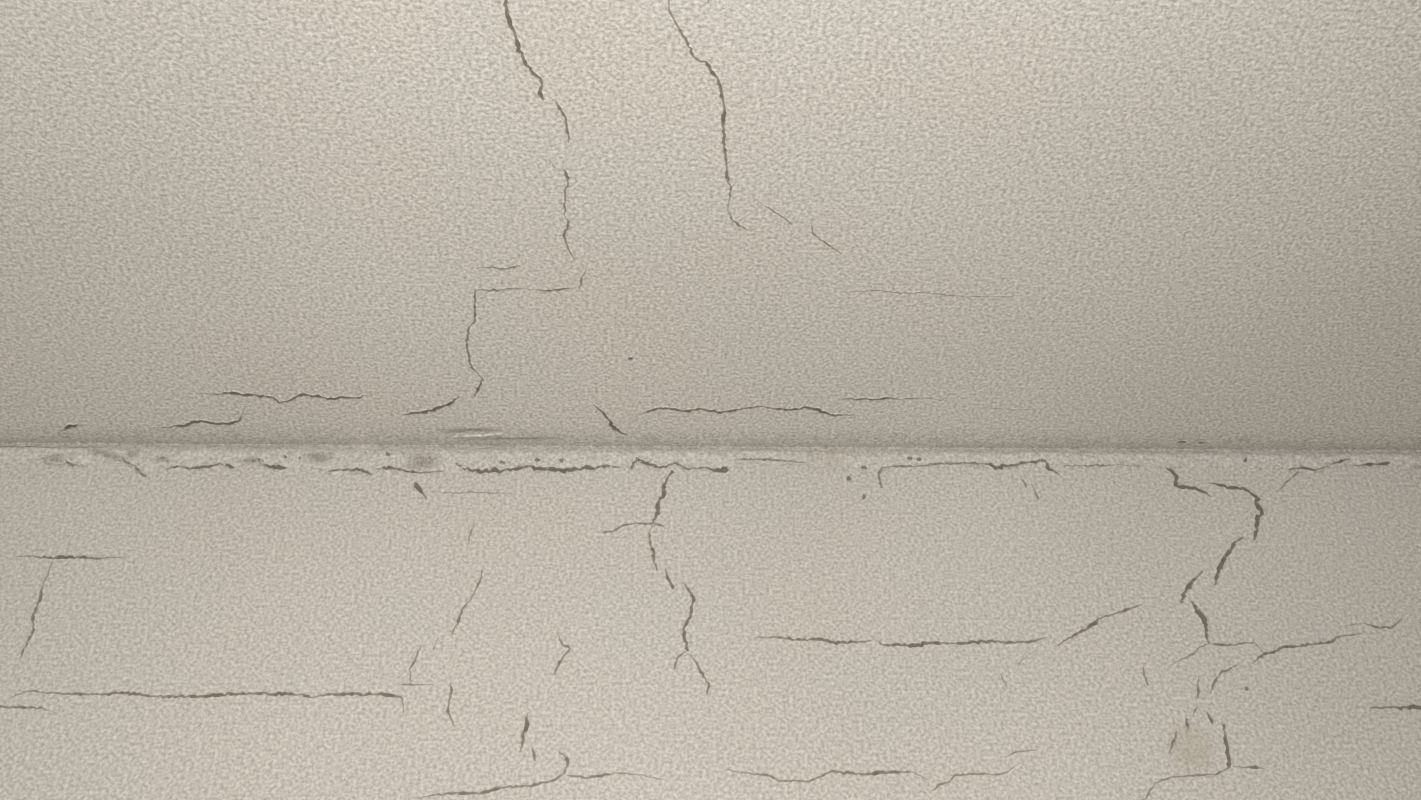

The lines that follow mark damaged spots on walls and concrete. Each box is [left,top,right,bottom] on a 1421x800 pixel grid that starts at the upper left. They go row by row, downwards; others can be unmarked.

crack [404,0,587,415]
crack [667,0,842,254]
crack [843,289,1014,297]
crack [0,389,1037,727]
crack [418,713,667,799]
crack [726,749,1038,791]
crack [754,603,1143,688]
crack [876,458,1421,800]